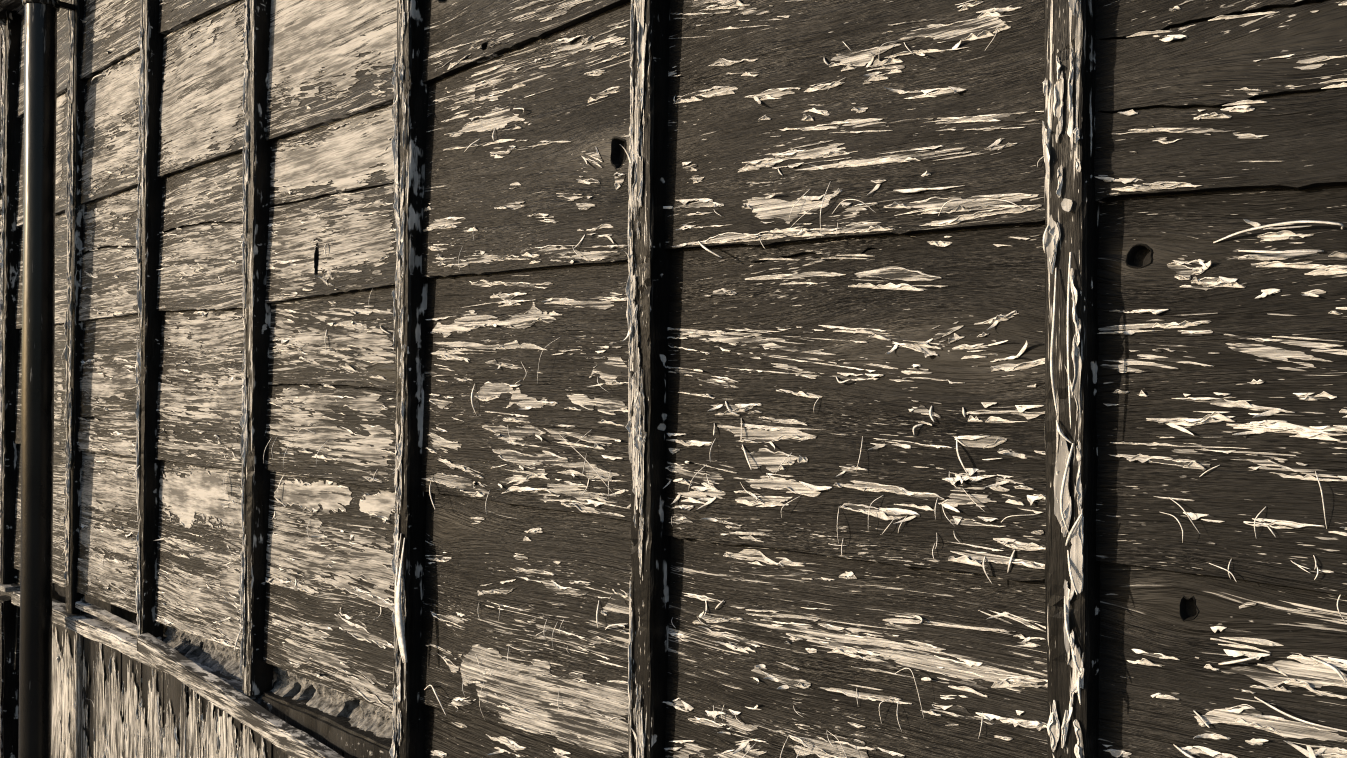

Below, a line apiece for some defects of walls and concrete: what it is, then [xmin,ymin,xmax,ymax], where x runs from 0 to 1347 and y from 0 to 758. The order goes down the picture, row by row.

crack [1101,0,1328,40]
peeling [1116,87,1269,144]
crack [1101,78,1347,113]
peeling [54,0,249,677]
peeling [263,0,407,758]
peeling [422,0,646,758]
peeling [663,0,1084,758]
peeling [1097,309,1347,373]
peeling [1167,255,1280,299]
peeling [1213,219,1347,297]
peeling [1108,391,1347,545]
peeling [1127,626,1347,758]